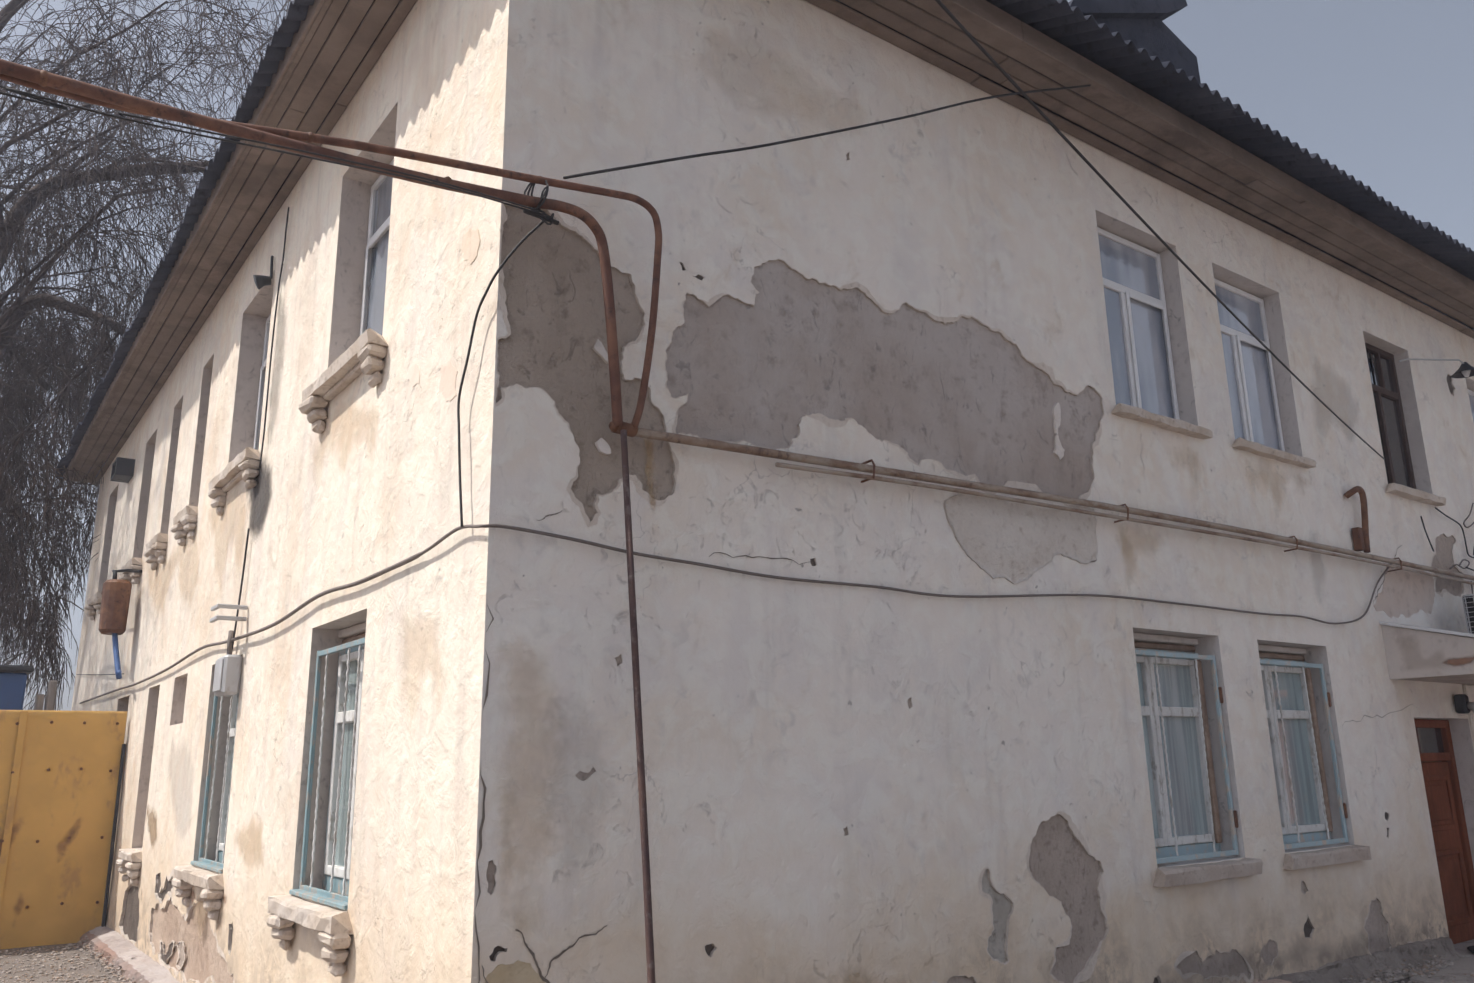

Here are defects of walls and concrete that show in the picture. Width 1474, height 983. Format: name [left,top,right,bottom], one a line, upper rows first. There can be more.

flaking render [495,202,1104,527]
crack [482,605,494,721]
flaking render [119,869,235,983]
crack [475,771,488,983]
peeling [485,946,545,983]
crack [515,925,607,983]
flaking render [978,867,1014,965]
flaking render [1026,811,1109,983]